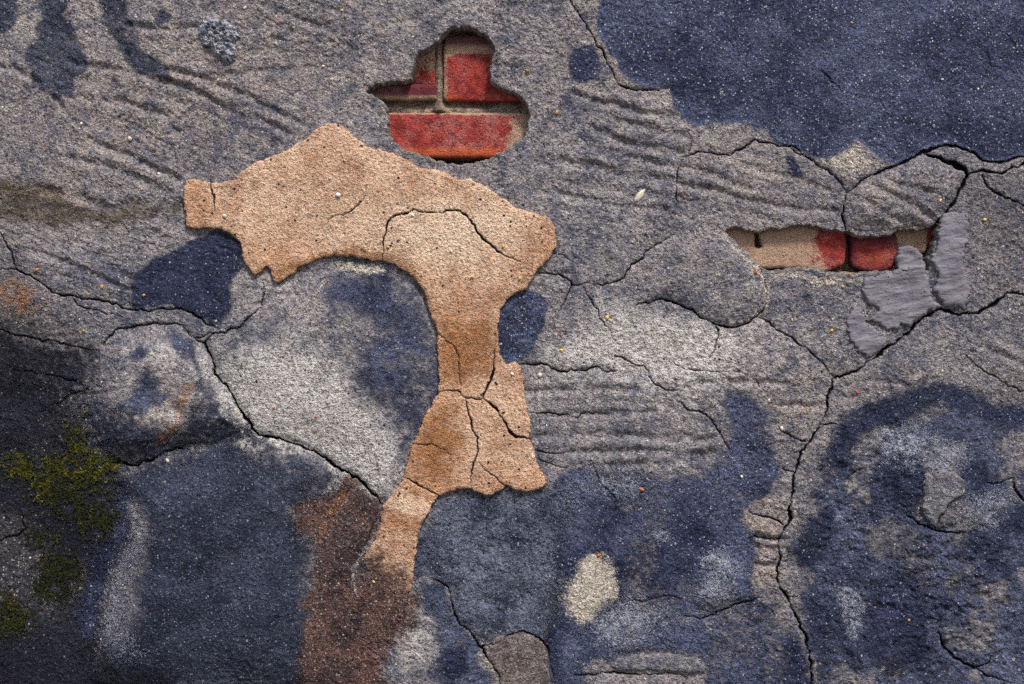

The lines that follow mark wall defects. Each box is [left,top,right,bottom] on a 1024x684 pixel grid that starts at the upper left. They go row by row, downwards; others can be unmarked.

spalling [364,24,532,168]
damp [568,0,1024,177]
damp [131,231,242,326]
spalling [723,222,940,277]
crack [675,140,1024,230]
damp [0,320,339,684]
crack [0,236,382,539]
corrosion [291,476,423,684]
peeling [364,476,438,599]
peeling [466,347,546,496]
damp [413,380,1024,684]
crack [439,242,1024,684]